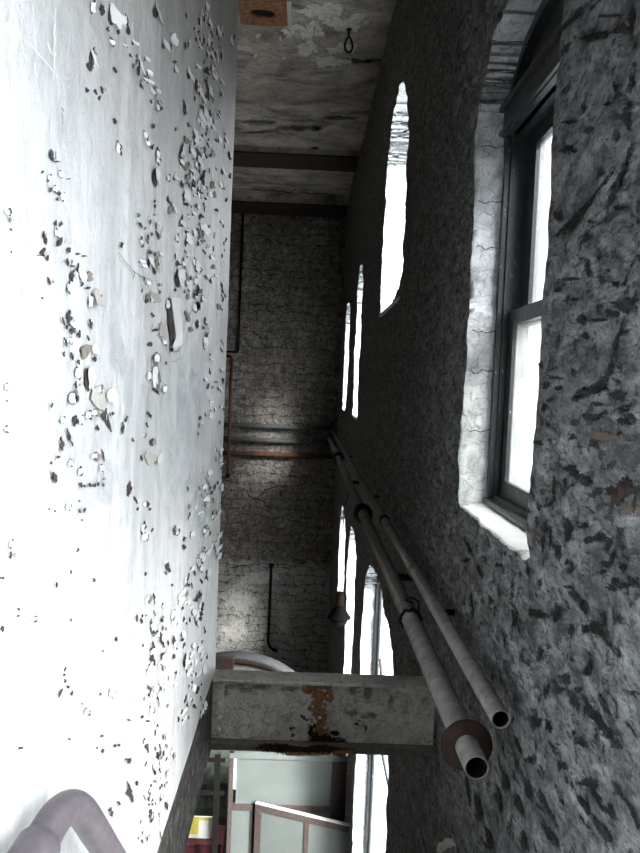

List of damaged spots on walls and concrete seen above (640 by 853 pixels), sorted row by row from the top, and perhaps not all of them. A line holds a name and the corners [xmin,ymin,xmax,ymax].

peeling [87,47,100,72]
peeling [90,0,163,112]
peeling [278,1,373,69]
peeling [41,149,71,202]
peeling [137,2,235,395]
peeling [37,220,106,308]
peeling [50,310,163,488]
peeling [198,400,225,436]
peeling [126,442,224,849]
rust [252,685,358,757]